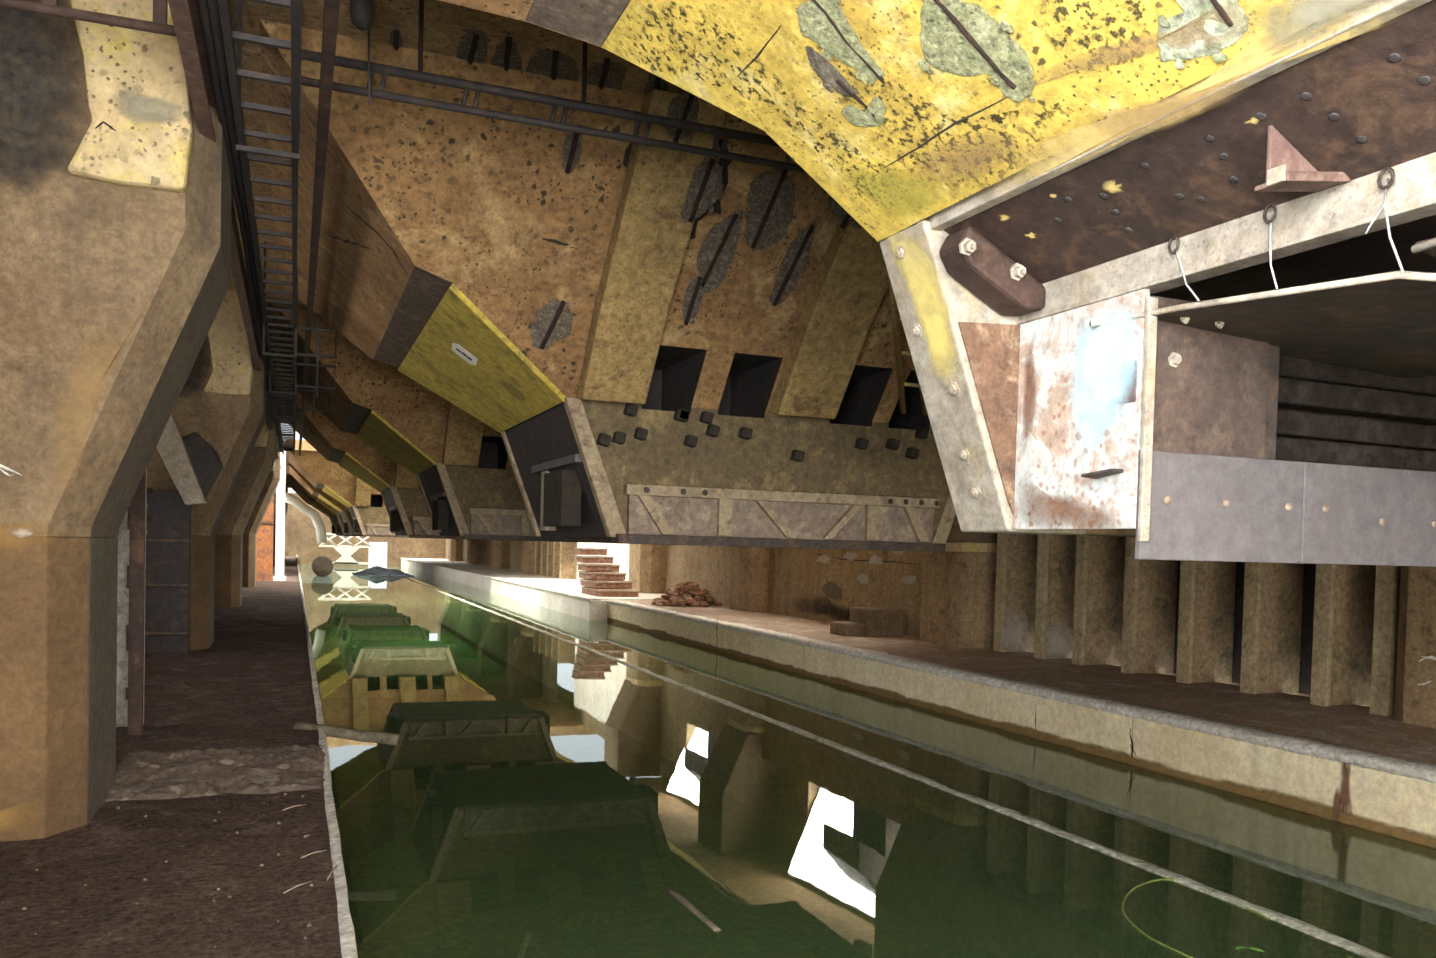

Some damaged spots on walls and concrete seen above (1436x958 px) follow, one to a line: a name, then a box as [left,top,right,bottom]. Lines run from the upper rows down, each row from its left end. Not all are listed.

spalling [796,0,886,127]
spalling [918,0,1035,103]
spalling [1157,0,1250,69]
corrosion [1023,356,1035,431]
corrosion [1031,493,1108,527]
corrosion [1332,762,1351,818]